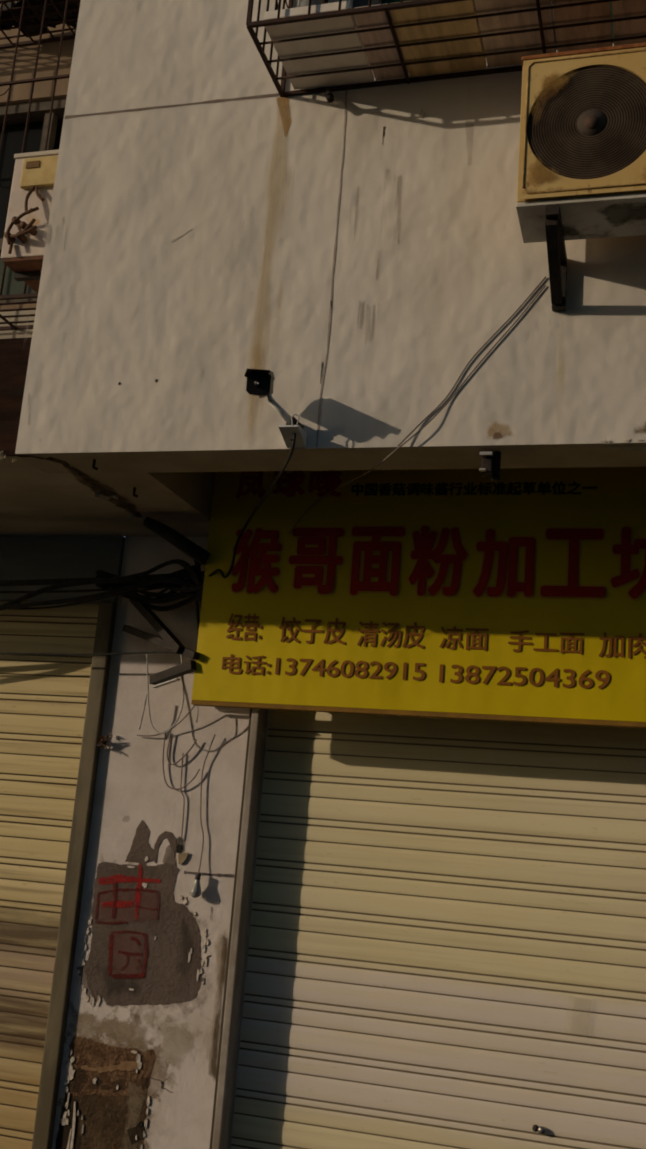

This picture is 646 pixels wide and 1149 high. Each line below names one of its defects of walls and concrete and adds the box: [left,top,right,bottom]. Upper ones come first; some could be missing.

corrosion [277,97,291,136]
damp [72,1007,151,1048]
damp [55,1083,154,1149]
flaking render [61,1034,166,1149]